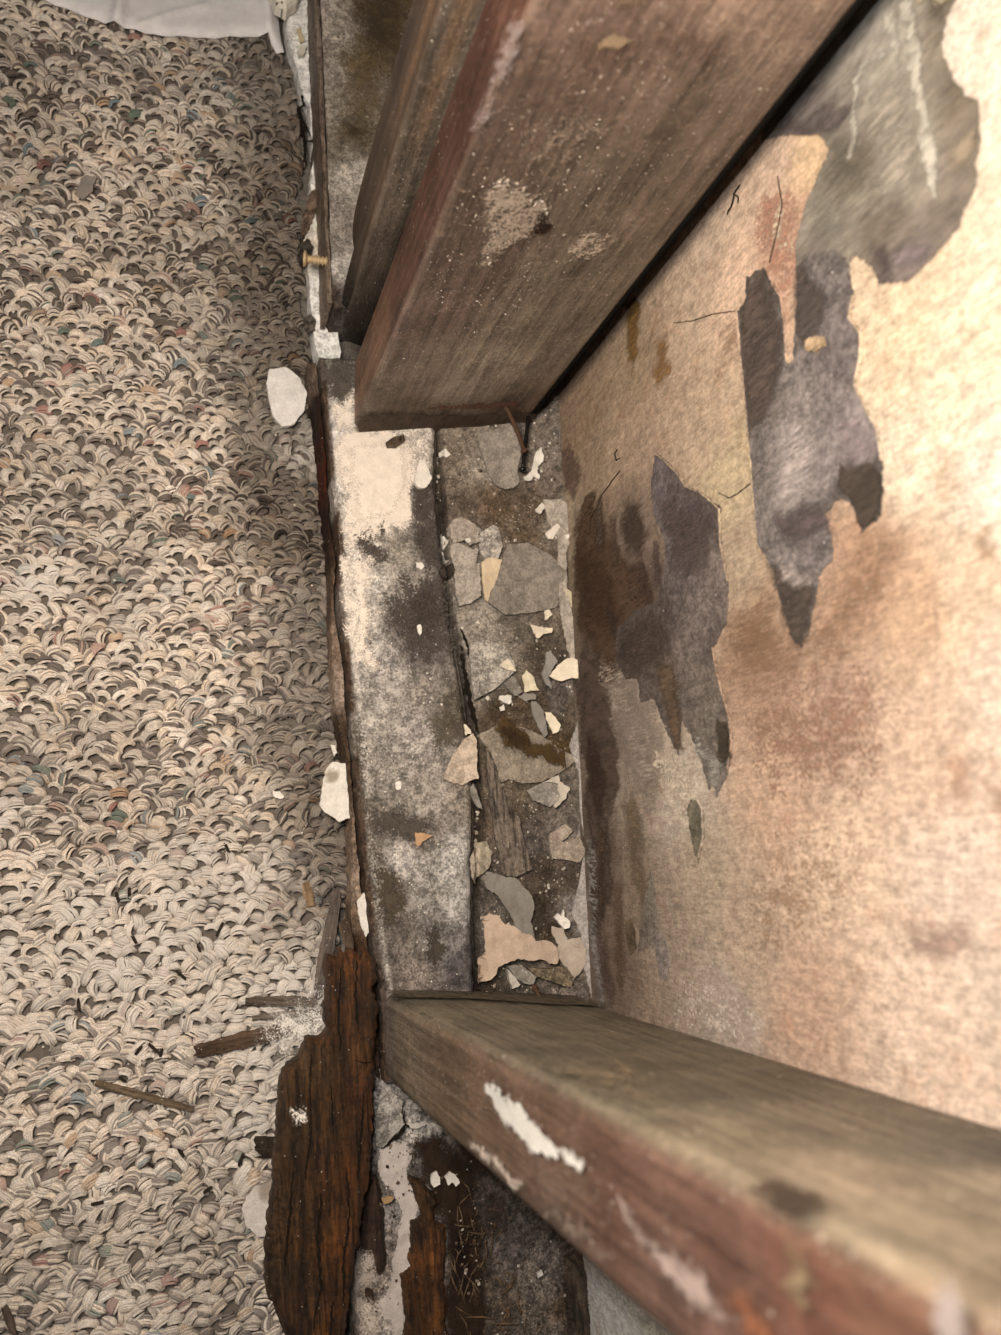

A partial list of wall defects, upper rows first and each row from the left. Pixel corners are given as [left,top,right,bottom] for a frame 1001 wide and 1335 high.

peeling [476,425,544,490]
damp [354,473,466,667]
peeling [441,517,482,564]
peeling [481,558,502,602]
peeling [545,524,569,540]
peeling [530,610,553,639]
peeling [443,650,579,810]
damp [389,445,703,1008]
damp [352,721,430,928]
peeling [548,824,585,862]
peeling [469,841,535,939]
peeling [375,1091,426,1148]